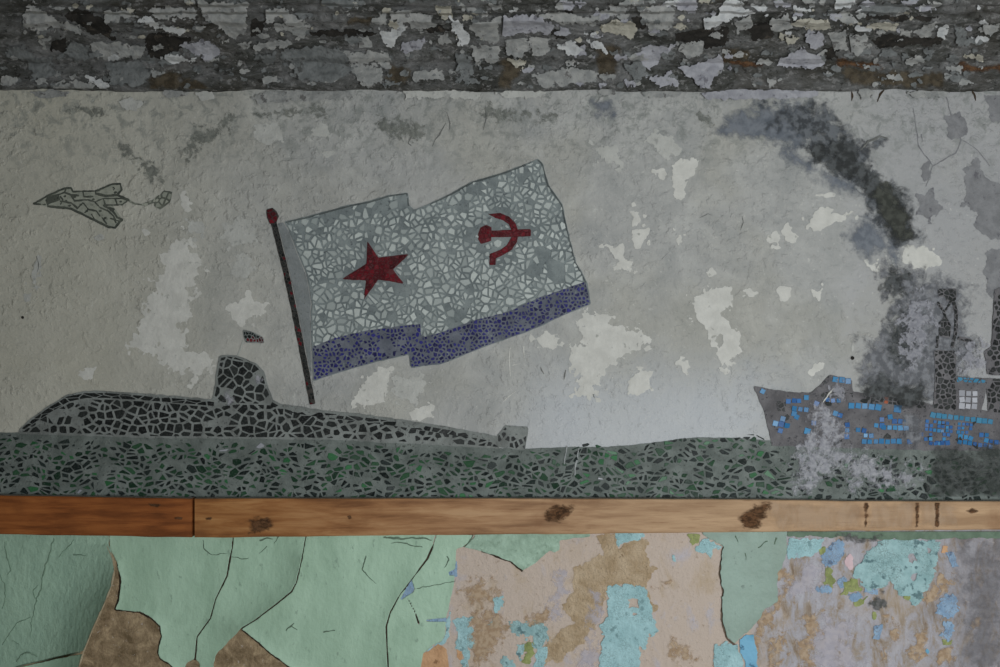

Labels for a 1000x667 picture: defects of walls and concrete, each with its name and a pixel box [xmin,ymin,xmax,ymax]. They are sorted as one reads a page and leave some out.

peeling [0,0,1000,104]
peeling [644,129,699,200]
peeling [599,202,650,274]
peeling [766,192,859,249]
peeling [864,244,942,272]
peeling [528,307,654,402]
peeling [686,267,758,375]
crack [0,538,84,667]
crack [114,537,278,667]
crack [241,537,306,667]
peeling [109,534,590,667]
peeling [703,532,1000,643]